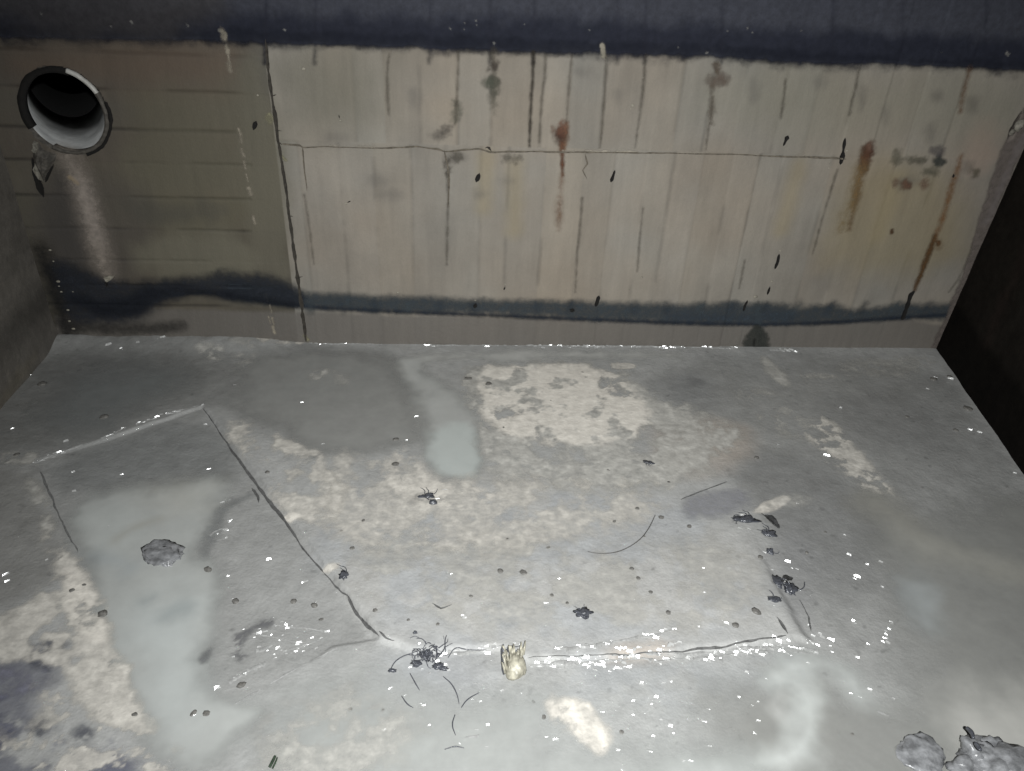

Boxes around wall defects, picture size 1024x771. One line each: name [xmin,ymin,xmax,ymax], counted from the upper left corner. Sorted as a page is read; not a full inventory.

crack [265,39,845,342]
corrosion [555,122,568,176]
corrosion [850,142,874,225]
damp [41,153,951,386]
corrosion [914,233,941,291]
crack [40,472,78,551]
crack [203,408,394,641]
damp [273,362,750,621]
crack [682,482,726,499]
damp [0,552,165,771]
damp [236,621,272,657]
crack [529,601,811,658]